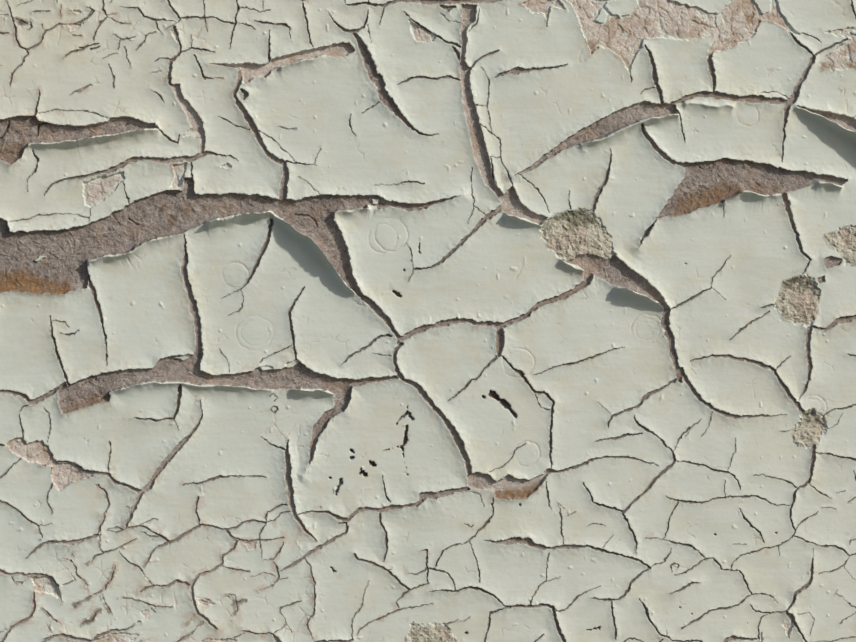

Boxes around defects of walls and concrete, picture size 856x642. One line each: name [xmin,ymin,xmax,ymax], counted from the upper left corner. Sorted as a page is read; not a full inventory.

spalling [0,115,157,165]
crack [9,124,239,222]
crack [0,0,322,200]
spalling [172,83,206,155]
spalling [0,162,459,298]
crack [328,0,612,282]
peeling [522,0,800,73]
crack [630,32,848,165]
spalling [639,157,848,247]
crack [180,233,230,372]
crack [0,257,856,642]
spalling [466,468,552,507]